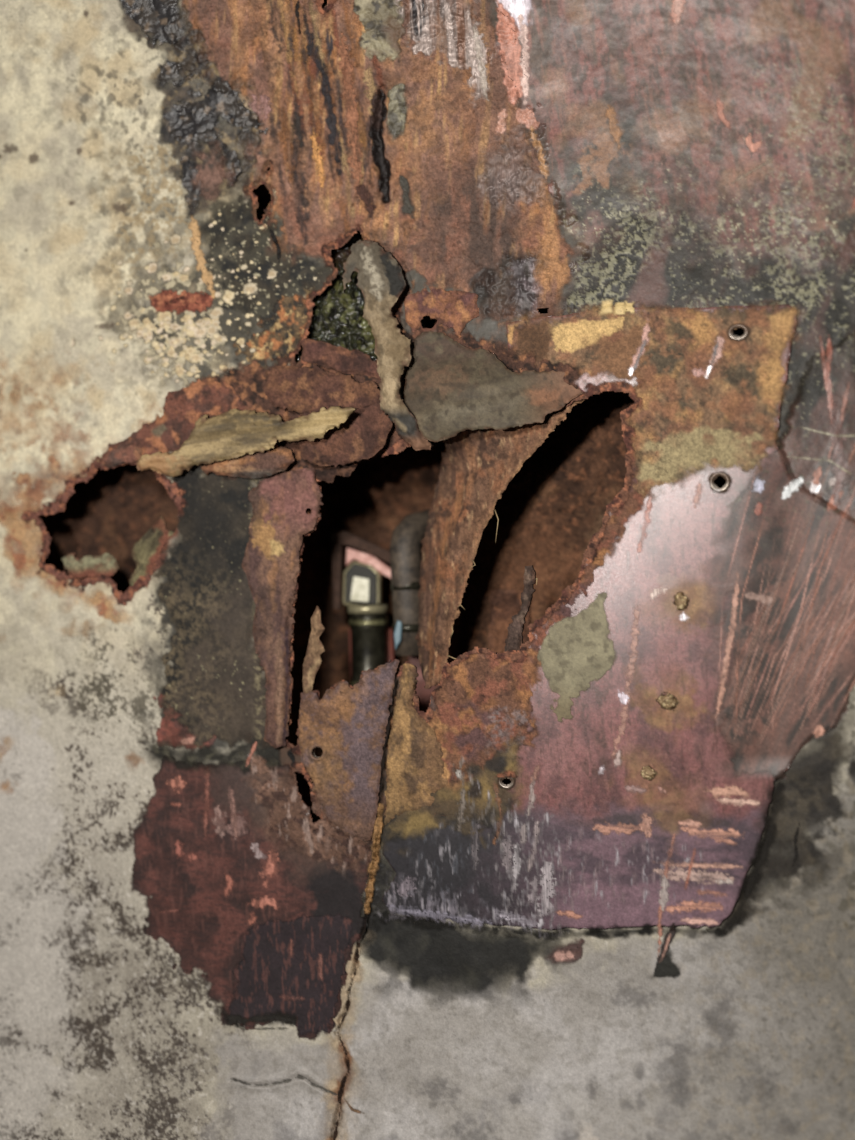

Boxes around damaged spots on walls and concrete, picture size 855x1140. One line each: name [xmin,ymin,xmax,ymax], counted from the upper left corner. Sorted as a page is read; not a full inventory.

corrosion [149,216,215,314]
peeling [342,240,433,451]
corrosion [0,295,404,594]
peeling [136,406,357,477]
corrosion [181,0,798,913]
corrosion [81,592,120,622]
peeling [537,592,615,722]
crack [379,678,397,803]
corrosion [327,947,361,1113]